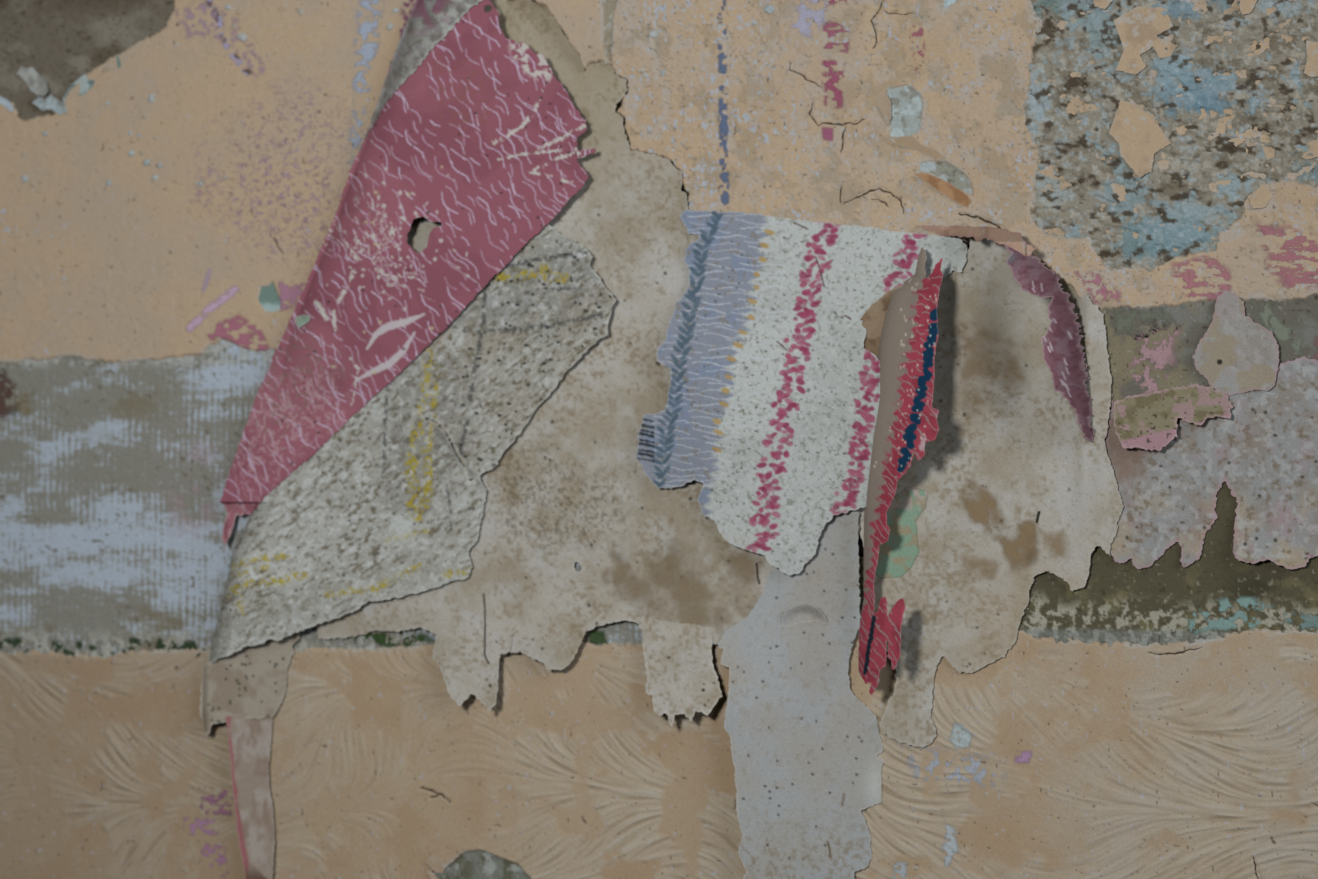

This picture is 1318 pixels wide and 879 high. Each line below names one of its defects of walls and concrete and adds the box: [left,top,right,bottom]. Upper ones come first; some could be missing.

peeling [0,0,175,121]
peeling [601,0,617,64]
flaking render [1024,0,1318,272]
peeling [258,282,281,312]
peeling [1098,300,1227,445]
peeling [1243,294,1318,367]
peeling [0,339,275,659]
peeling [856,488,928,635]
peeling [1018,481,1318,647]
peeling [293,626,437,652]
peeling [582,621,643,646]
spalling [425,850,531,879]